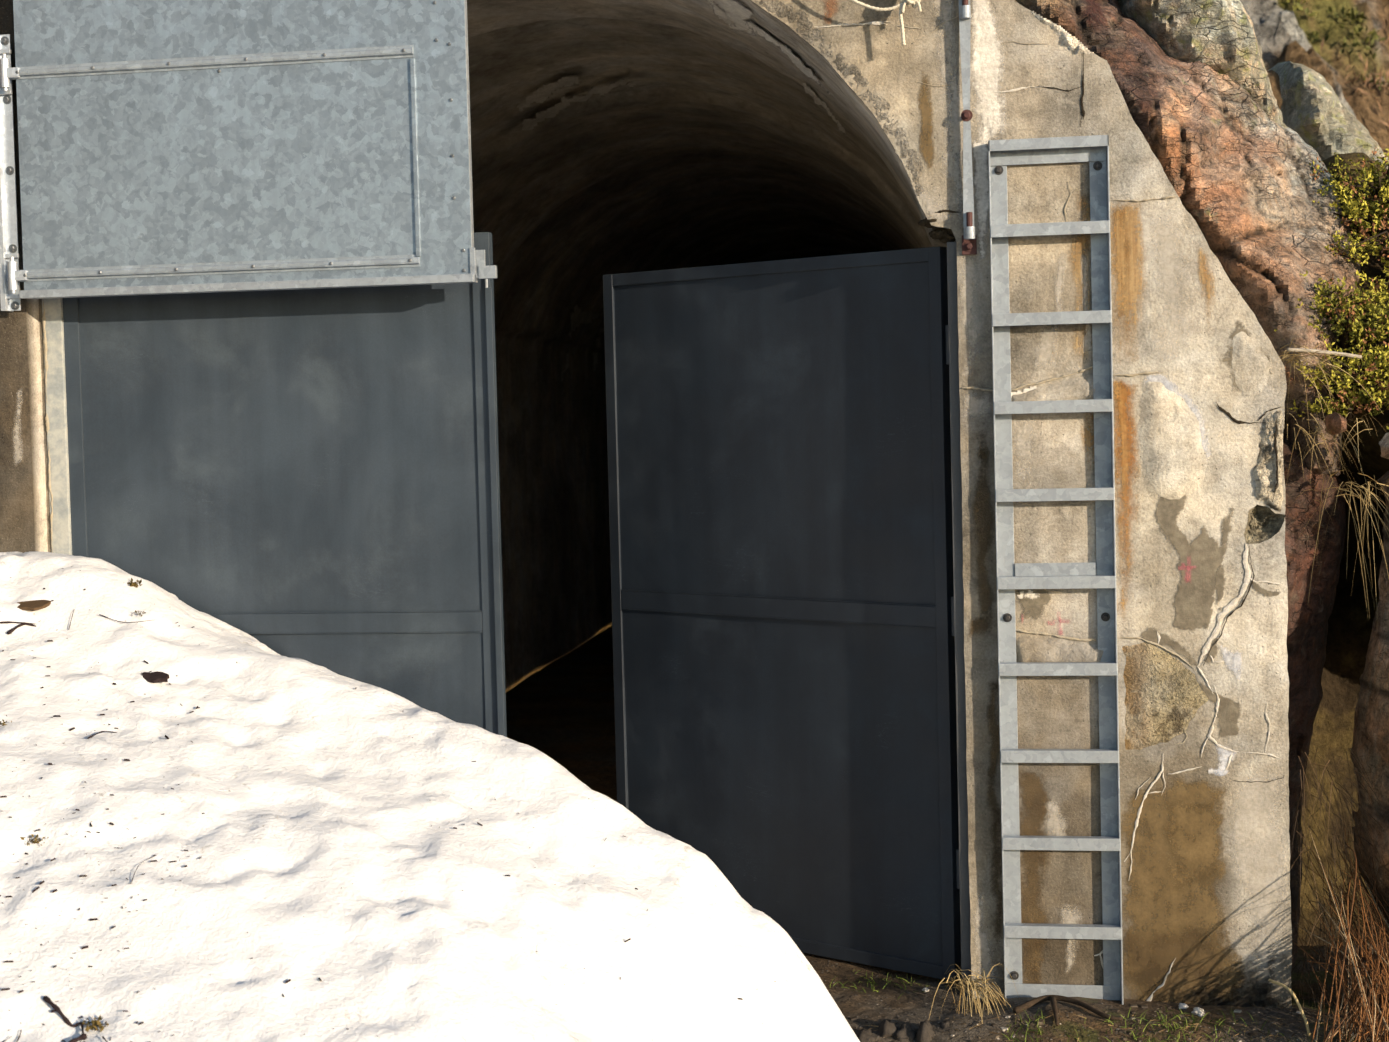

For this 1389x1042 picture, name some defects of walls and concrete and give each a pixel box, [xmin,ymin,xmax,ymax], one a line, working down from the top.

corrosion [1110,206,1143,334]
crack [1216,402,1280,502]
damp [1141,495,1242,678]
damp [1252,582,1281,597]
crack [1124,544,1284,878]
damp [1120,683,1285,1006]